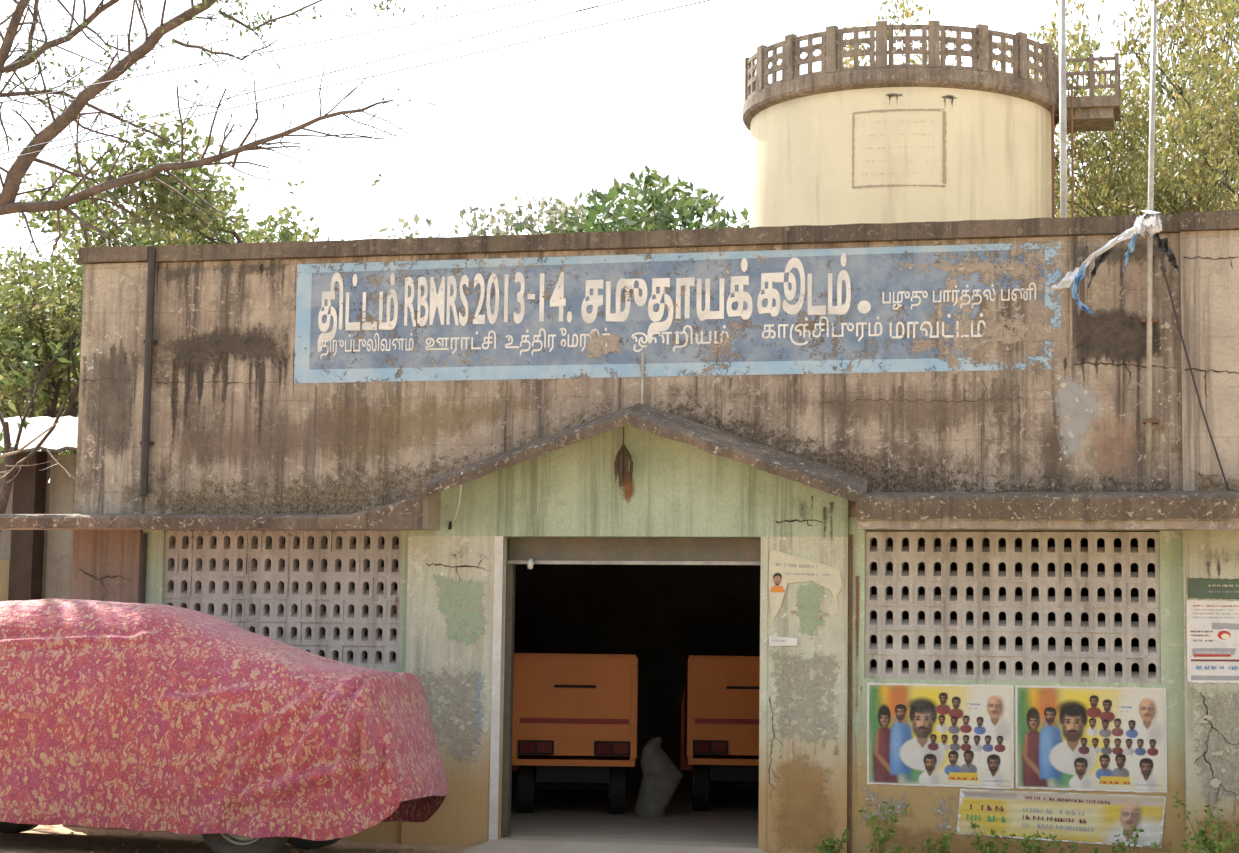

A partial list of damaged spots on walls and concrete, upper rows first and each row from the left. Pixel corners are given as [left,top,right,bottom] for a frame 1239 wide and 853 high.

peeling [888,257,1037,282]
damp [170,324,369,465]
peeling [922,312,1036,353]
damp [1064,309,1161,390]
peeling [434,574,487,646]
peeling [770,582,841,750]
peeling [412,668,491,772]
crack [1195,693,1239,812]